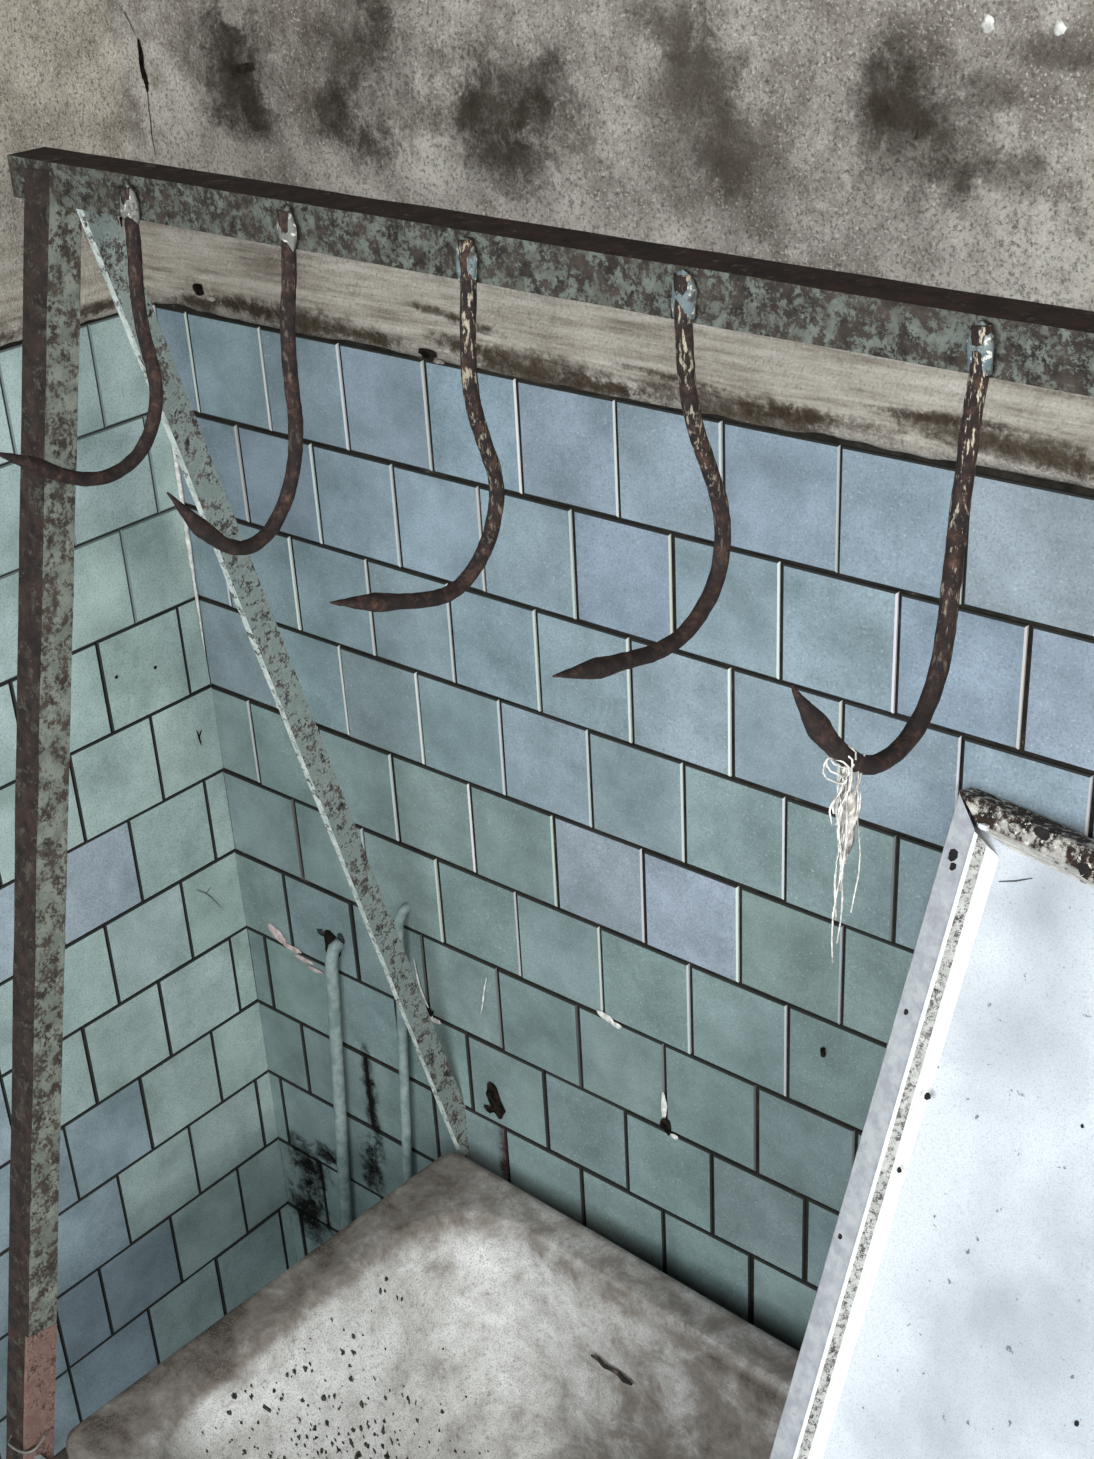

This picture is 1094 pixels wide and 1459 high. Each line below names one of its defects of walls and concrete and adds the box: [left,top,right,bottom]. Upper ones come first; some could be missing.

crack [119,5,156,157]
damp [316,25,384,128]
damp [456,57,559,177]
damp [862,53,969,193]